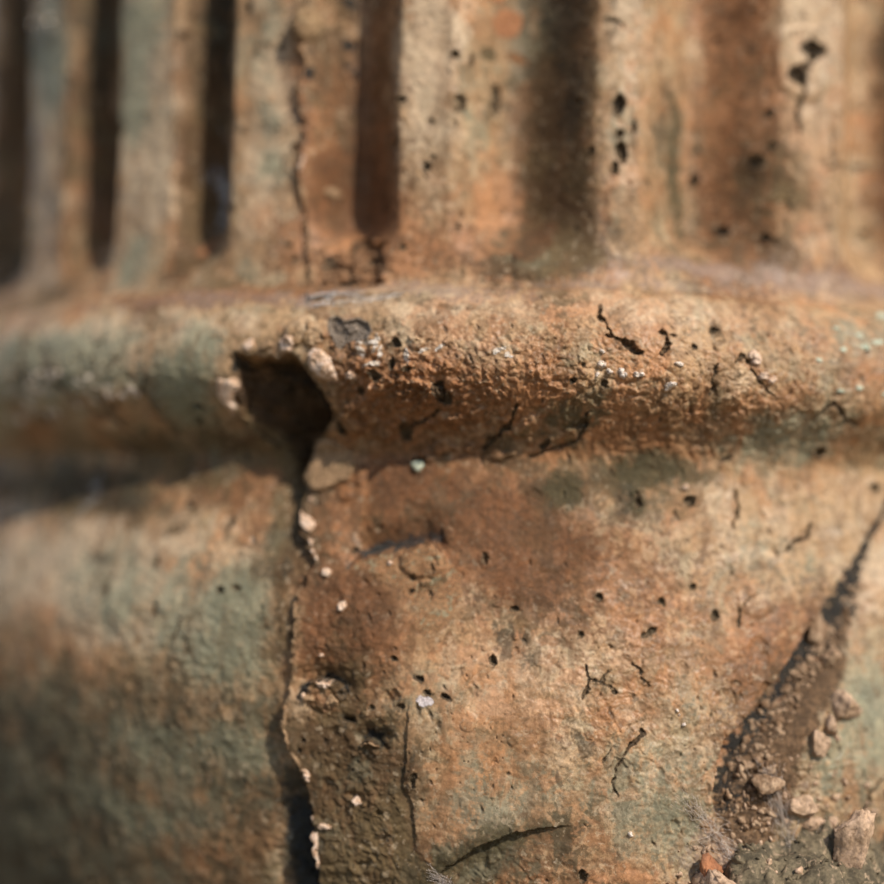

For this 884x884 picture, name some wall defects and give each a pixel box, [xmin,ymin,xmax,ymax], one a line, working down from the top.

spalling [290,142,388,302]
crack [597,305,675,357]
spalling [217,316,445,501]
crack [411,409,440,428]
crack [481,404,519,450]
crack [528,411,592,459]
peeling [300,510,318,560]